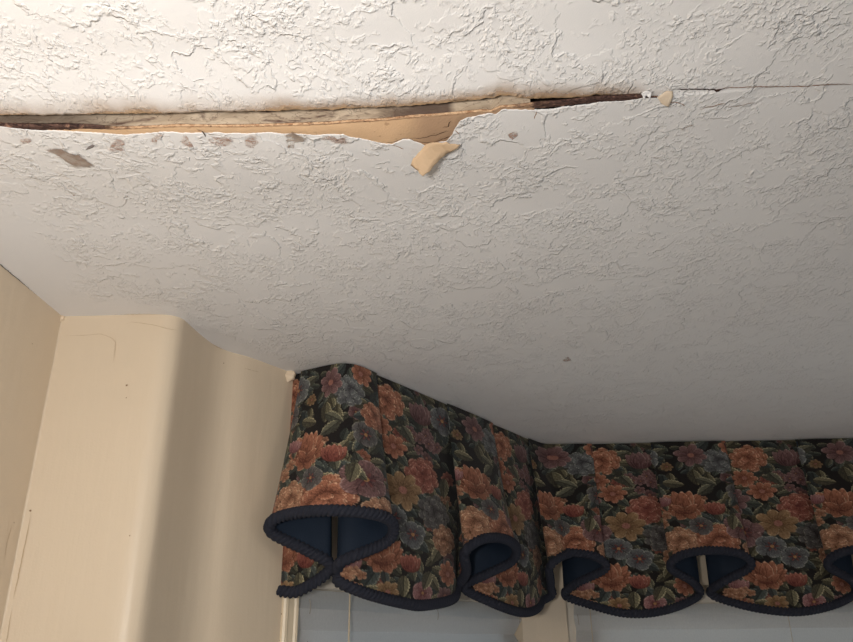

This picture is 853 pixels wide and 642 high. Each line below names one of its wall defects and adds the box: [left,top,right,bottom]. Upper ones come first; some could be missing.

crack [0,84,850,137]
spalling [49,145,95,168]